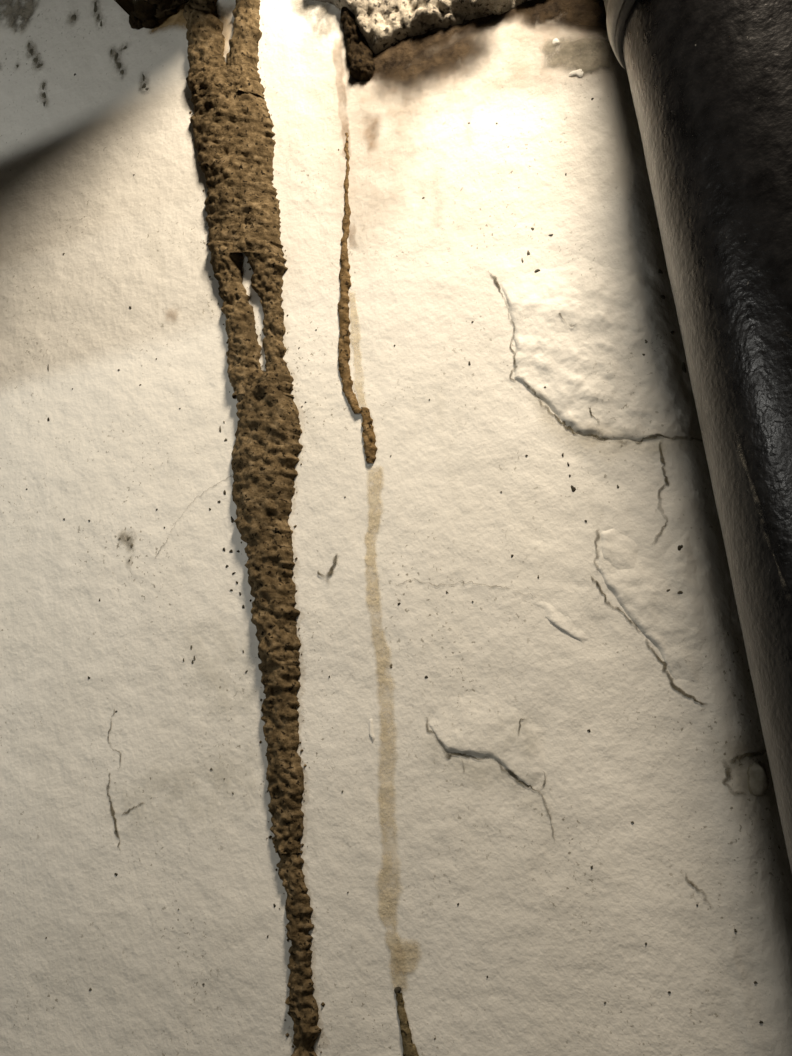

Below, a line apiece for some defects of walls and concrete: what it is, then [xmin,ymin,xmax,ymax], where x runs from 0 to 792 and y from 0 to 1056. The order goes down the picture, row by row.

spalling [296,0,611,87]
crack [510,326,607,441]
crack [637,434,684,497]
leakage [365,468,382,607]
crack [591,534,704,705]
crack [426,724,551,819]
leakage [379,855,417,987]